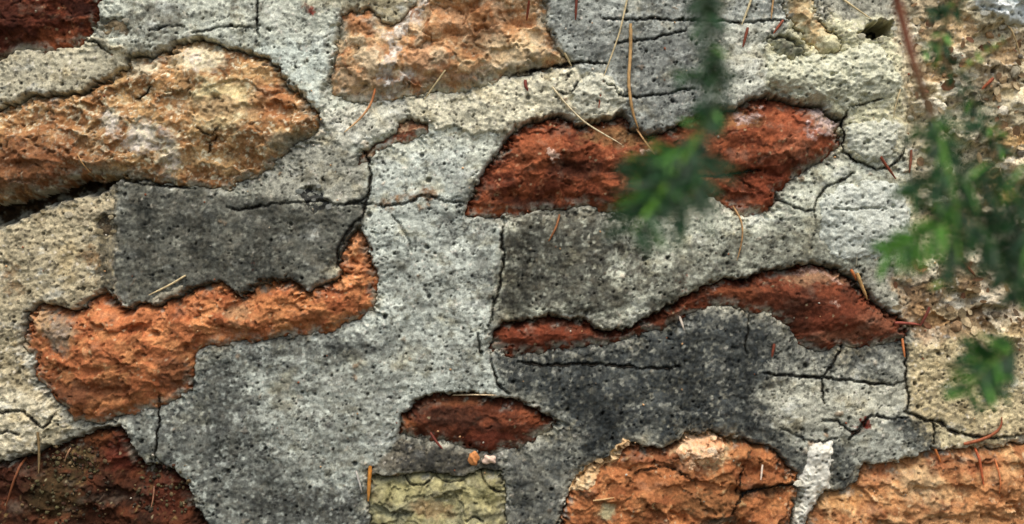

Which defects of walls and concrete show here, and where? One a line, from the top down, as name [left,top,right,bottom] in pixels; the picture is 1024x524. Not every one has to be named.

crack [604,17,786,43]
crack [513,61,694,98]
crack [776,98,905,217]
peeling [148,285,183,304]
crack [477,231,509,394]
crack [518,361,680,370]
crack [765,345,1019,444]
spalling [569,438,630,491]
peeling [676,430,725,472]